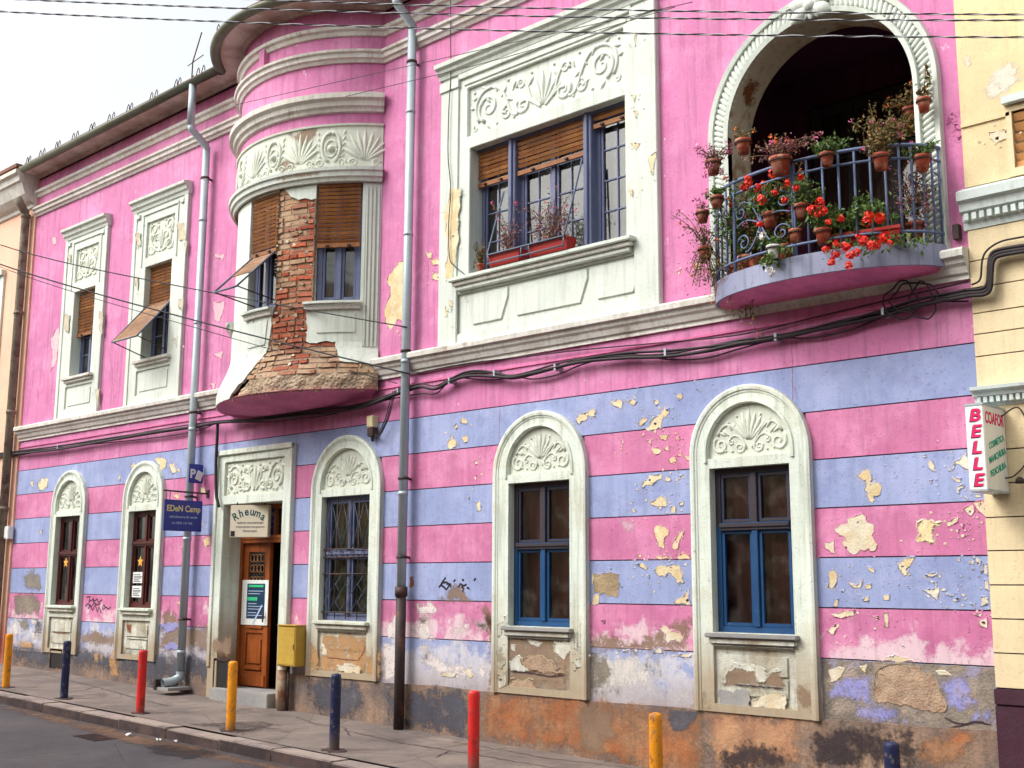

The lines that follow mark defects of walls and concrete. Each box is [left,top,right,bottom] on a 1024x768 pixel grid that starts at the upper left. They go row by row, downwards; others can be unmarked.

spalling [232,185,378,401]
peeling [382,187,463,346]
flaking render [589,387,691,605]
peeling [817,450,991,645]
peeling [383,612,396,680]
spalling [496,614,591,691]
damp [576,620,692,752]
spalling [718,662,787,709]
damp [796,686,811,707]
spalling [821,644,997,730]
damp [720,743,784,768]
damp [810,720,924,768]